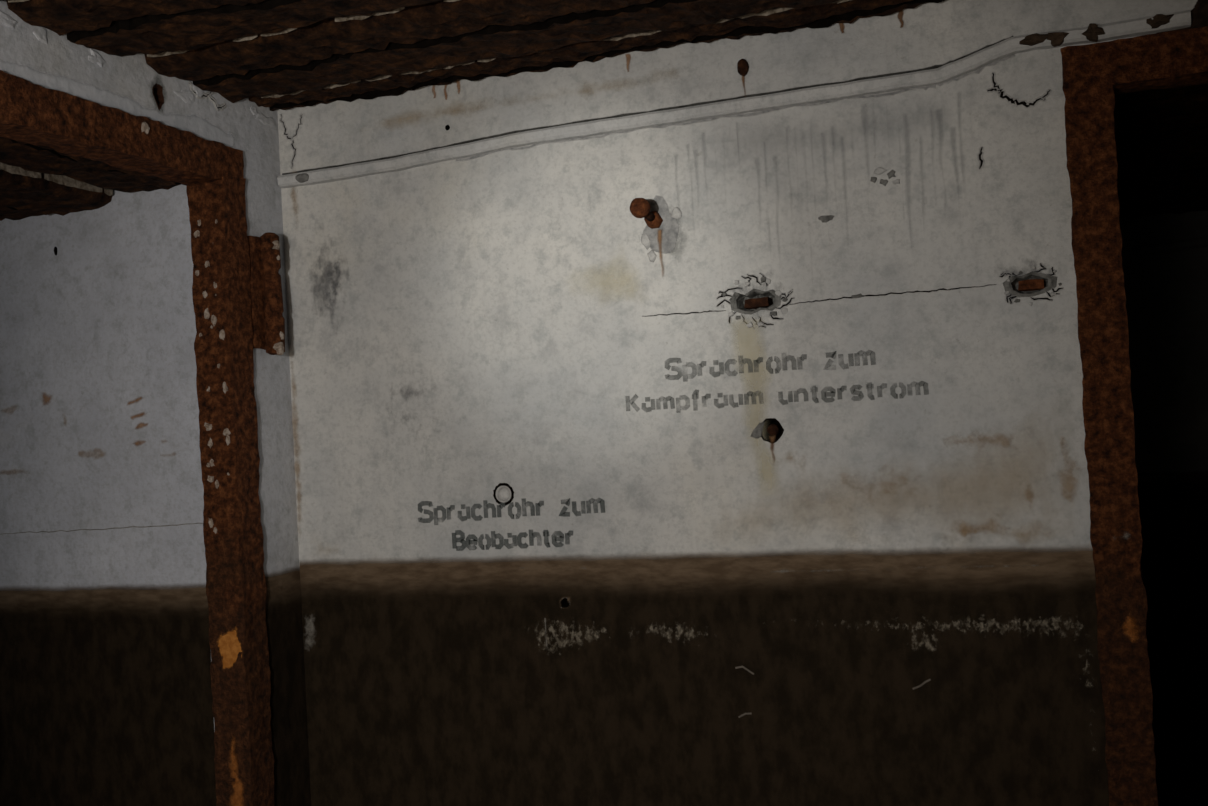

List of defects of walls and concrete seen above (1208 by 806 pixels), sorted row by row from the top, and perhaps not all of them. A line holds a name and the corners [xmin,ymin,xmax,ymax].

crack [279,35,1052,175]
hole [716,272,795,330]
hole [999,263,1064,306]
corrosion [128,397,147,446]
spalling [750,418,784,443]
corrosion [217,628,242,669]
corrosion [230,741,243,806]